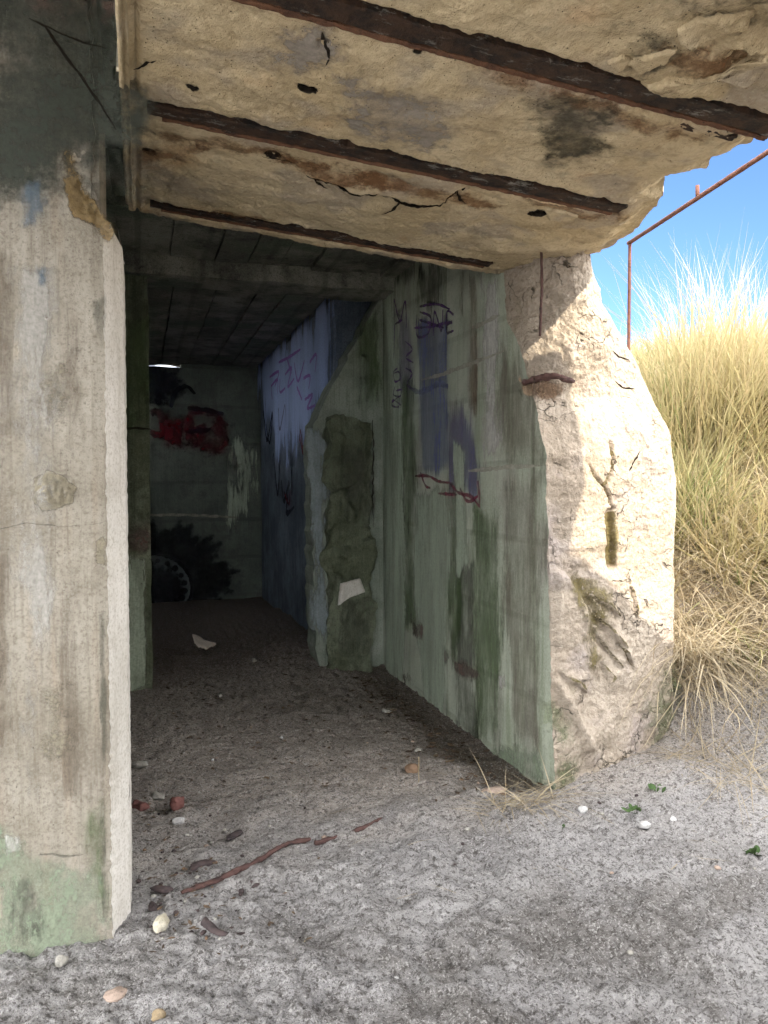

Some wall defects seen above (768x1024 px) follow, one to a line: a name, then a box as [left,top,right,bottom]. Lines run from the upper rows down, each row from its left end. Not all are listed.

crack [29,18,116,130]
crack [321,32,330,65]
corrosion [665,47,745,78]
leakage [528,94,618,166]
spalling [63,150,114,241]
corrosion [132,130,496,209]
crack [262,156,466,214]
leakage [481,281,506,455]
leakage [383,265,478,739]
crack [589,446,640,509]
spalling [338,578,365,605]
leakage [5,835,18,852]